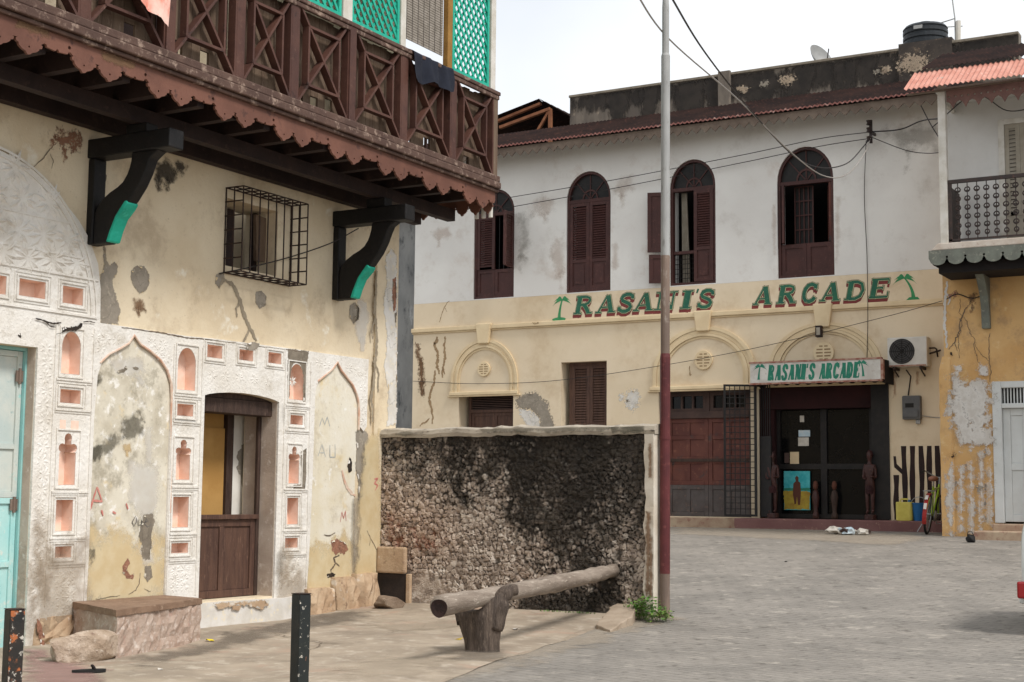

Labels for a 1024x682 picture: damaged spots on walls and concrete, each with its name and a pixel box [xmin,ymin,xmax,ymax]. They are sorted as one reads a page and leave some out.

spalling [736,74,796,94]
spalling [873,49,929,76]
peeling [100,247,121,325]
peeling [131,266,150,293]
crack [122,276,301,352]
peeling [384,248,398,426]
crack [420,301,449,426]
crack [943,281,992,375]
peeling [515,392,554,427]
peeling [944,352,997,536]
peeling [122,513,155,582]
spalling [331,538,348,555]